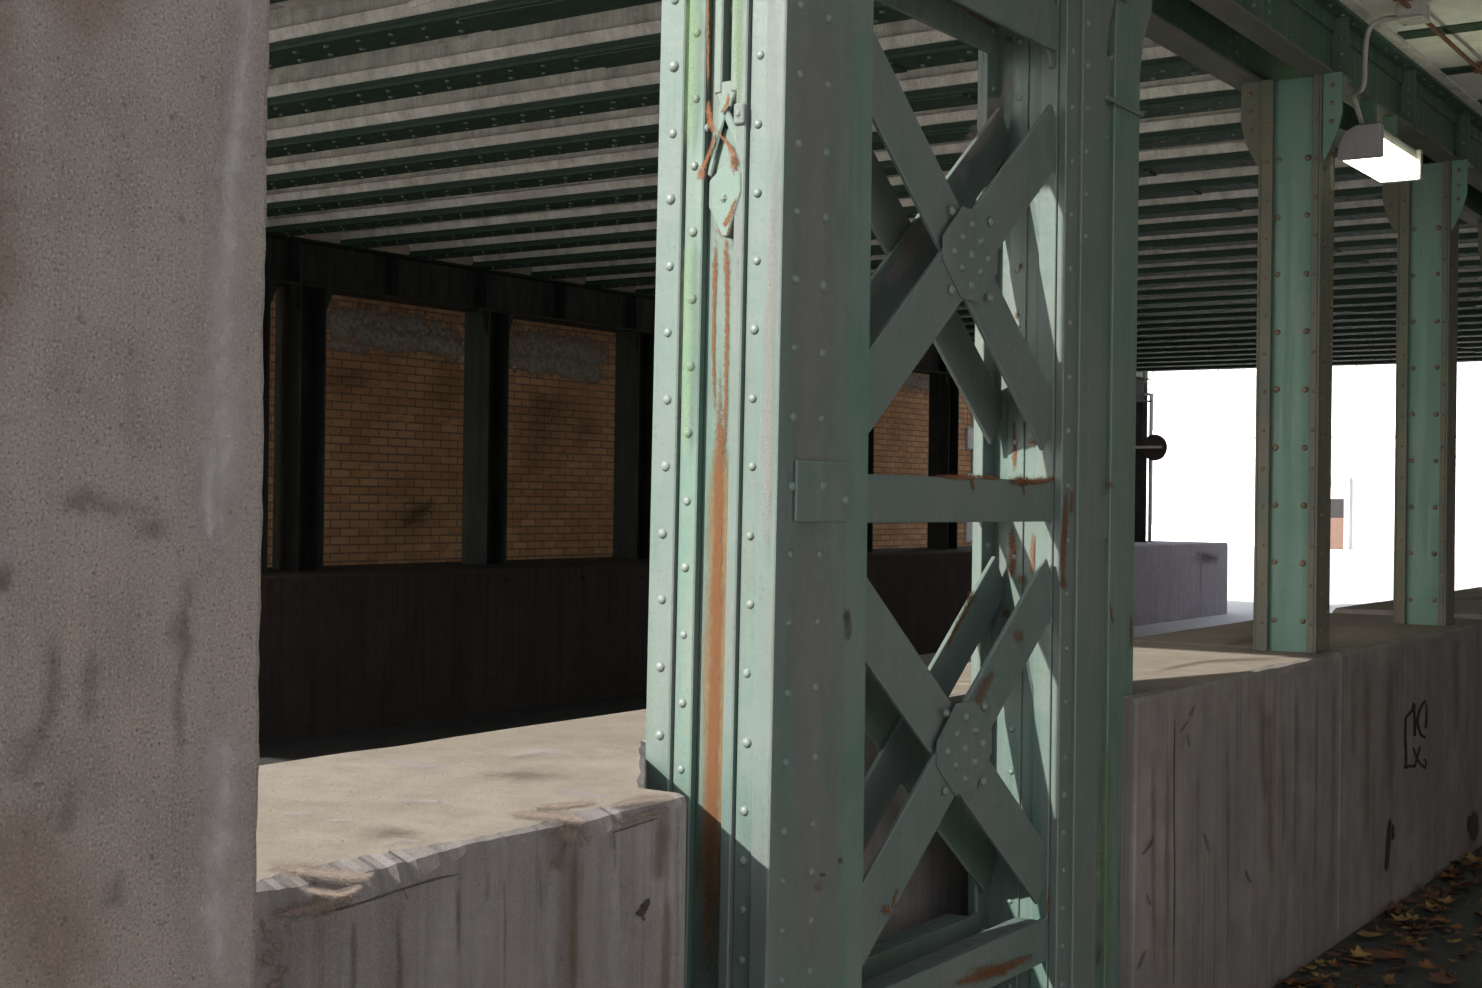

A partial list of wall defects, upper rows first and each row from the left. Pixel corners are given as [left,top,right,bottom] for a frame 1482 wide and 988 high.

rust [697,94,738,179]
rust [938,423,1055,496]
rust [703,200,736,927]
rust [1008,528,1035,584]
rust [1060,490,1074,588]
spalling [512,800,593,848]
rust [955,955,1033,985]